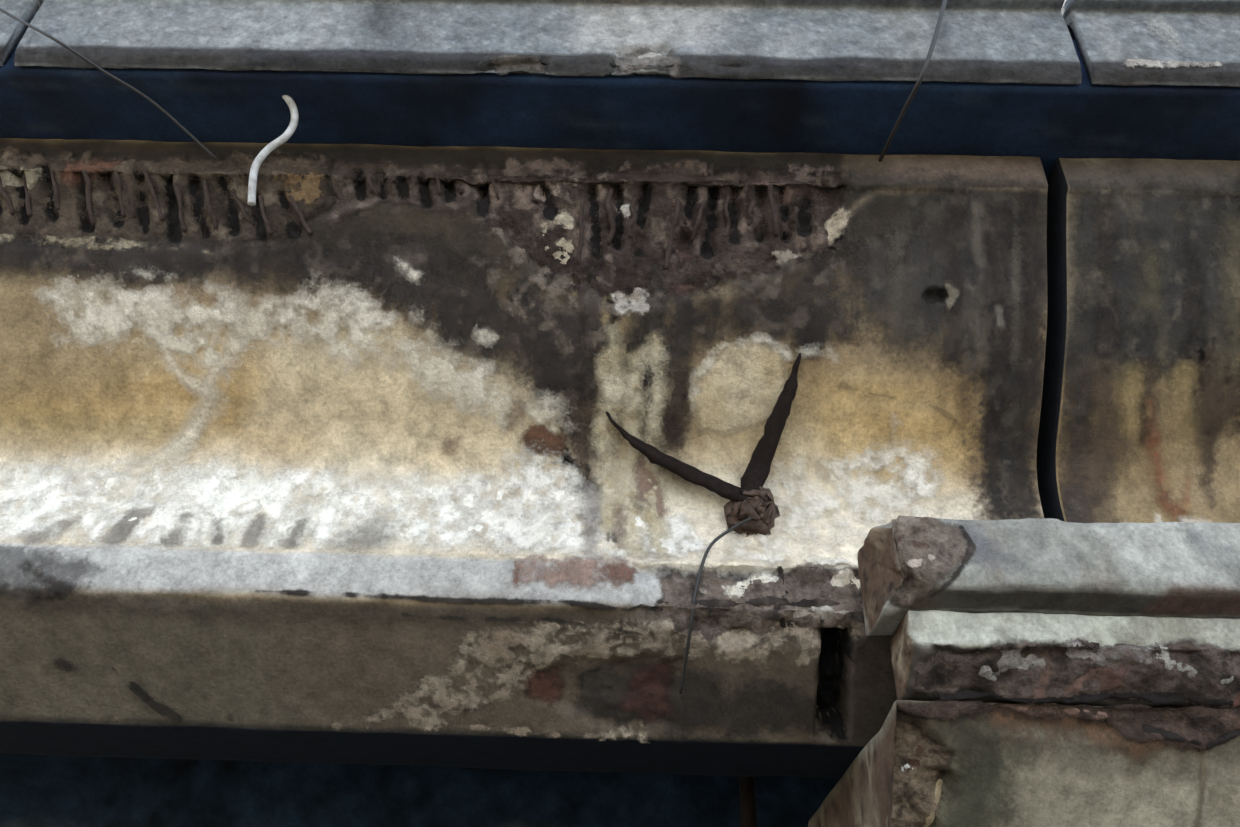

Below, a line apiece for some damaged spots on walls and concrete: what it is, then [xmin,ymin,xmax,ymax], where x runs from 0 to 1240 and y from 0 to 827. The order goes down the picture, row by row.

spalling [0,147,851,401]
damp [0,176,1047,562]
damp [1058,178,1240,523]
peeling [469,724,530,736]
peeling [585,728,646,743]
spalling [368,555,868,730]
spalling [890,515,976,607]
spalling [891,638,1240,827]